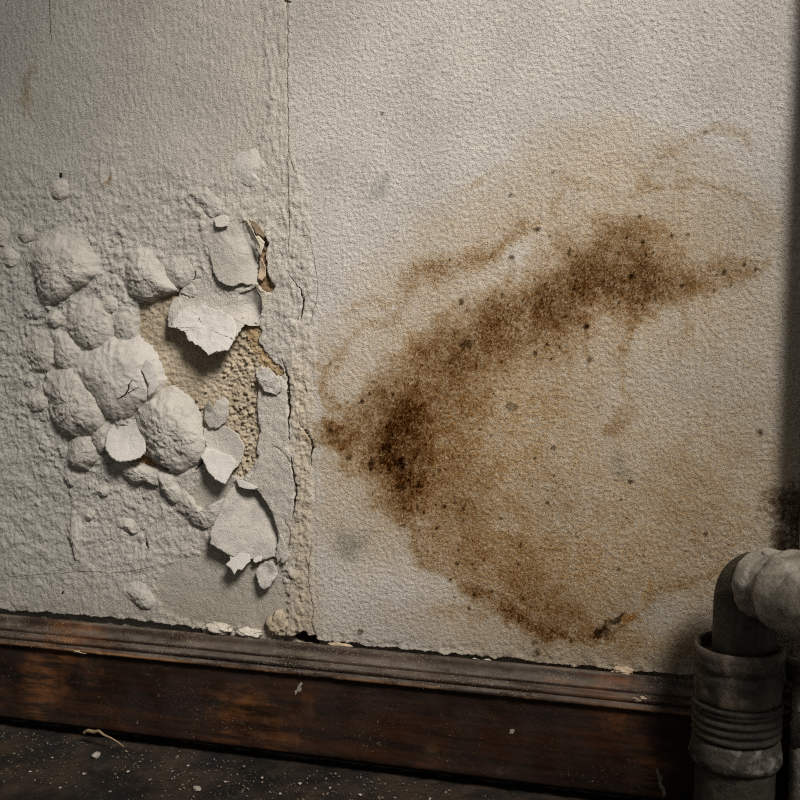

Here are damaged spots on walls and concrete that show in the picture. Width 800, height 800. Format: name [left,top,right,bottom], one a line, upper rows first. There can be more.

crack [284,0,319,331]
spalling [139,215,289,590]
crack [274,358,317,550]
crack [286,541,315,634]
leakage [317,214,721,658]